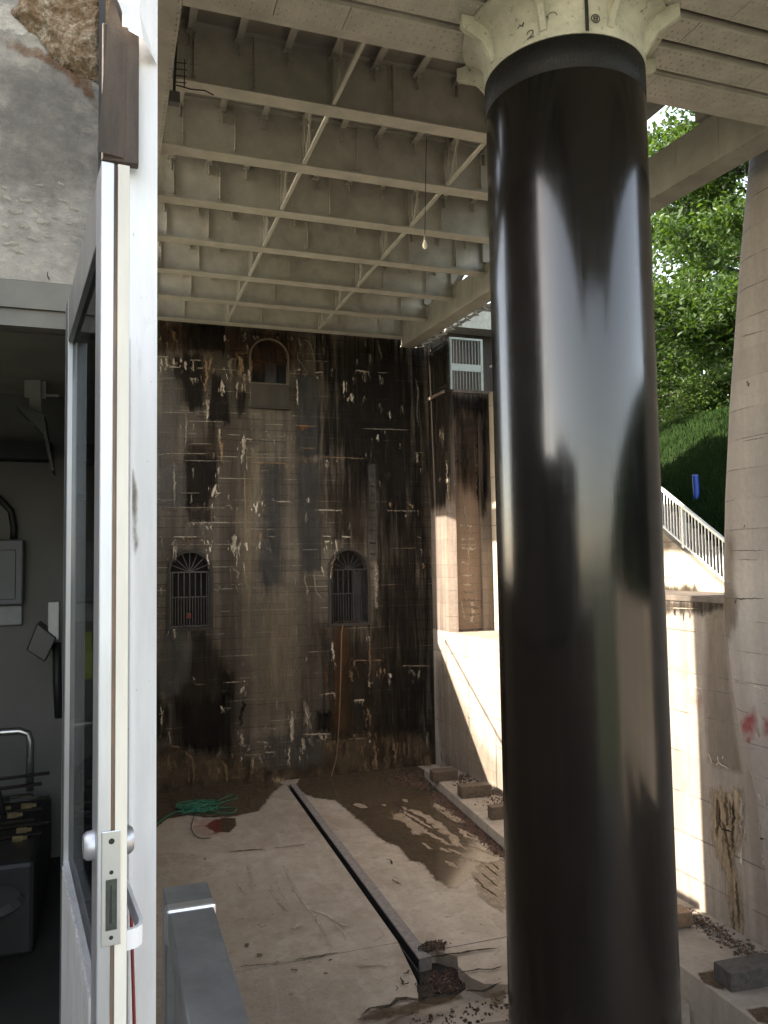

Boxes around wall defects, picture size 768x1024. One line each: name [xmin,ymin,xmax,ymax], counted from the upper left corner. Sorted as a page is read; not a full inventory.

spalling [11,0,110,84]
water stain [147,321,506,911]
crack [362,946,501,1015]